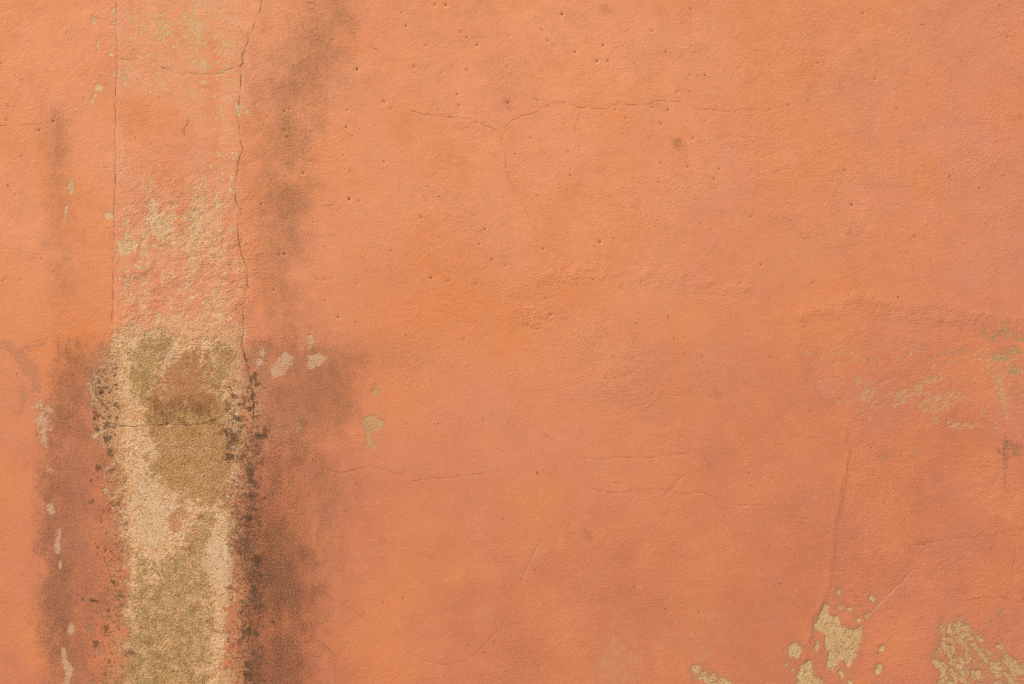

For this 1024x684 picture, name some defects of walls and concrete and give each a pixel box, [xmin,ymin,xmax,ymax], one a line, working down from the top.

peeling [86,151,327,684]
leakage [88,327,306,684]
peeling [689,665,731,684]
peeling [784,589,868,684]
peeling [931,615,1024,684]